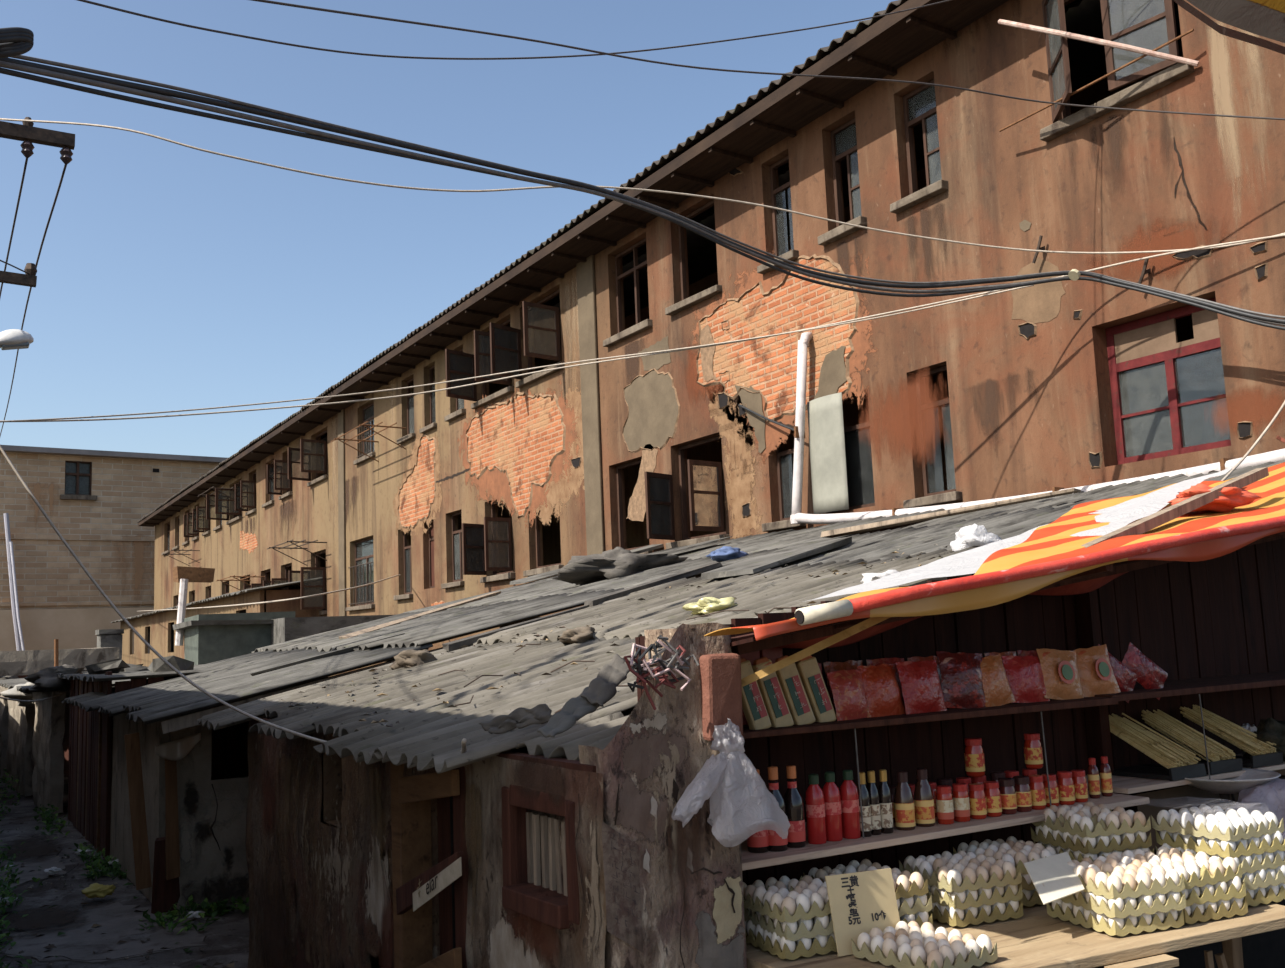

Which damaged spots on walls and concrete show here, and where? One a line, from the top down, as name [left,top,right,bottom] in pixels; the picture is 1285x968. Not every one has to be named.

crack [1173,138,1207,231]
flaking render [393,379,585,536]
flaking render [691,248,878,539]
flaking render [621,715,690,803]